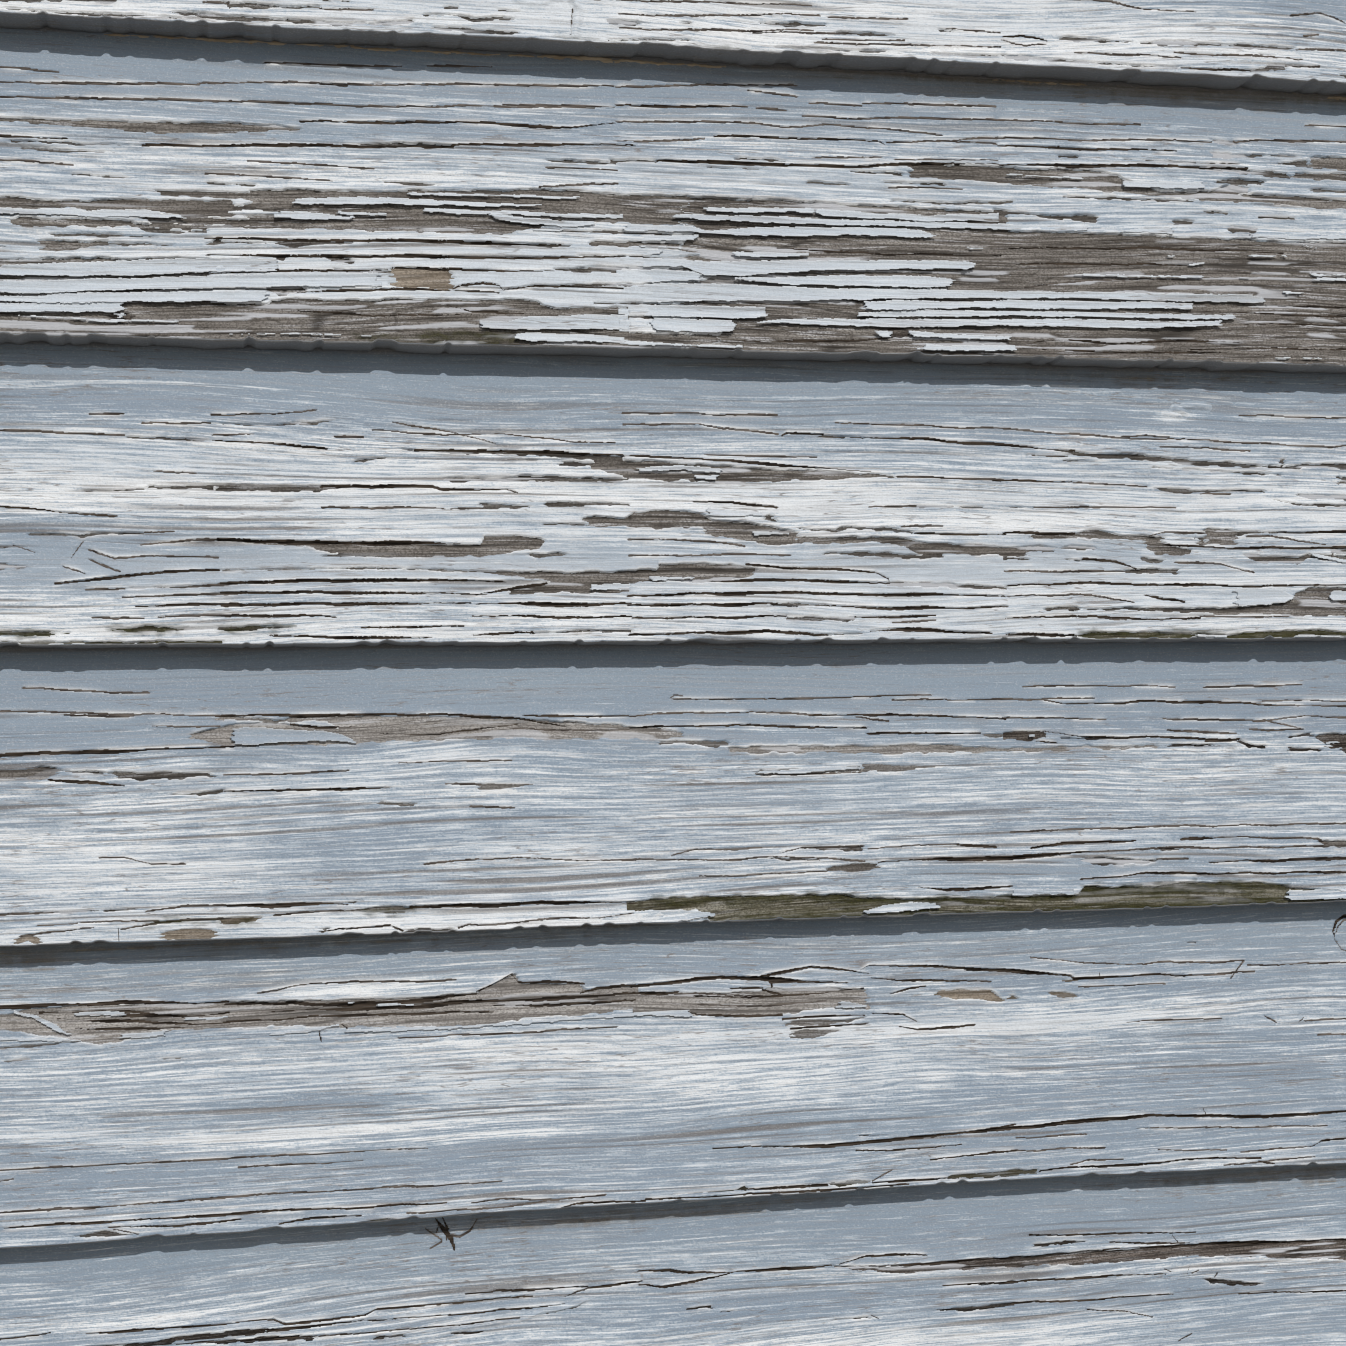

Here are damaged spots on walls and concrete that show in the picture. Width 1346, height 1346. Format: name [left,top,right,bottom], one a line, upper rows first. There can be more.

peeling [0,0,518,35]
peeling [607,0,1346,72]
peeling [399,448,1004,484]
peeling [818,435,1346,476]
peeling [217,501,1346,639]
peeling [0,626,222,644]
peeling [189,713,1158,776]
peeling [626,881,1346,922]
peeling [0,973,871,1062]
crack [86,1253,927,1346]
crack [940,1231,1346,1318]
crack [0,1332,51,1340]